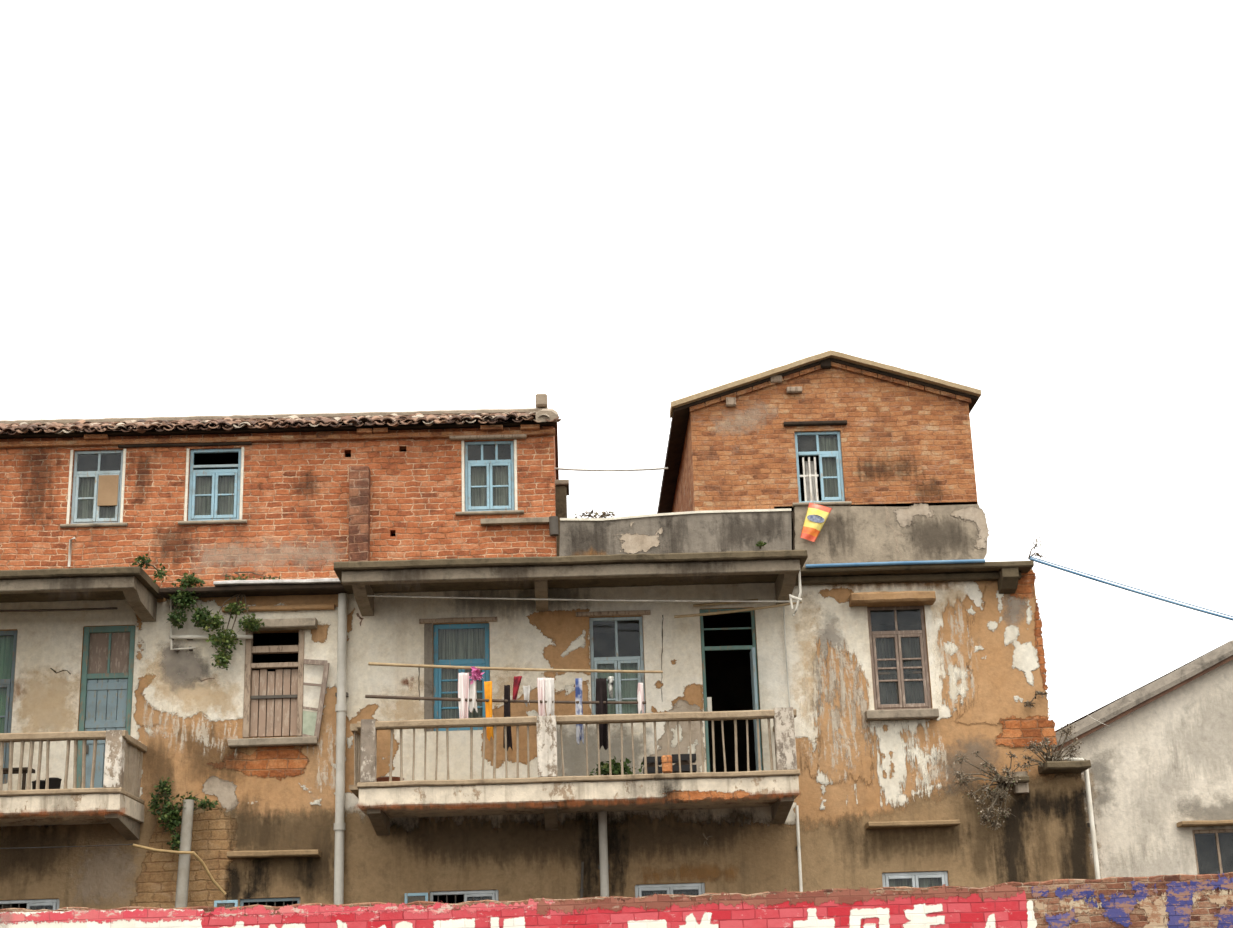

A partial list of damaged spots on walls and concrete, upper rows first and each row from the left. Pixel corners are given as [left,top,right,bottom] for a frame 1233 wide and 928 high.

spalling [616,522,663,554]
peeling [819,587,854,604]
peeling [134,673,165,739]
peeling [481,608,592,769]
spalling [649,683,706,773]
peeling [798,637,943,810]
peeling [937,567,1057,748]
spalling [130,704,400,909]
spalling [662,789,752,801]